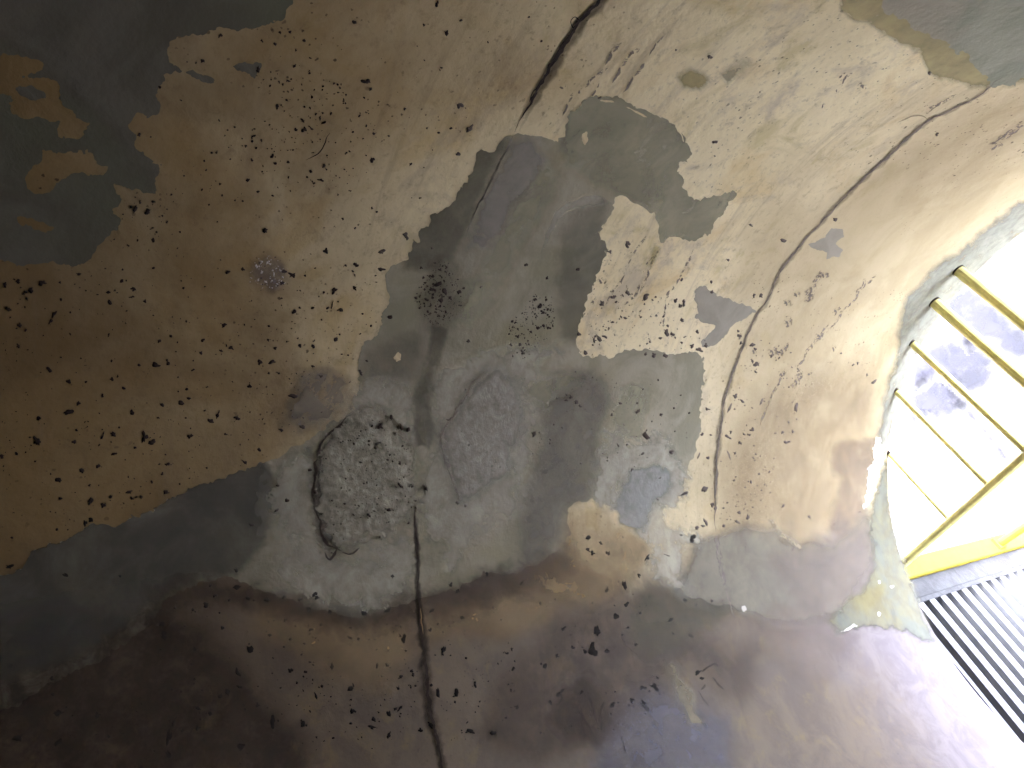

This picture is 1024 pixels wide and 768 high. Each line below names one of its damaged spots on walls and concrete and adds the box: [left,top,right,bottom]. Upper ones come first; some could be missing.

peeling [0,0,293,267]
crack [474,0,607,214]
peeling [882,0,1024,88]
peeling [126,95,756,634]
crack [714,77,1003,618]
leakage [219,592,418,750]
crack [414,506,446,768]
leakage [430,679,489,740]
leakage [571,580,647,657]
leakage [566,663,731,768]